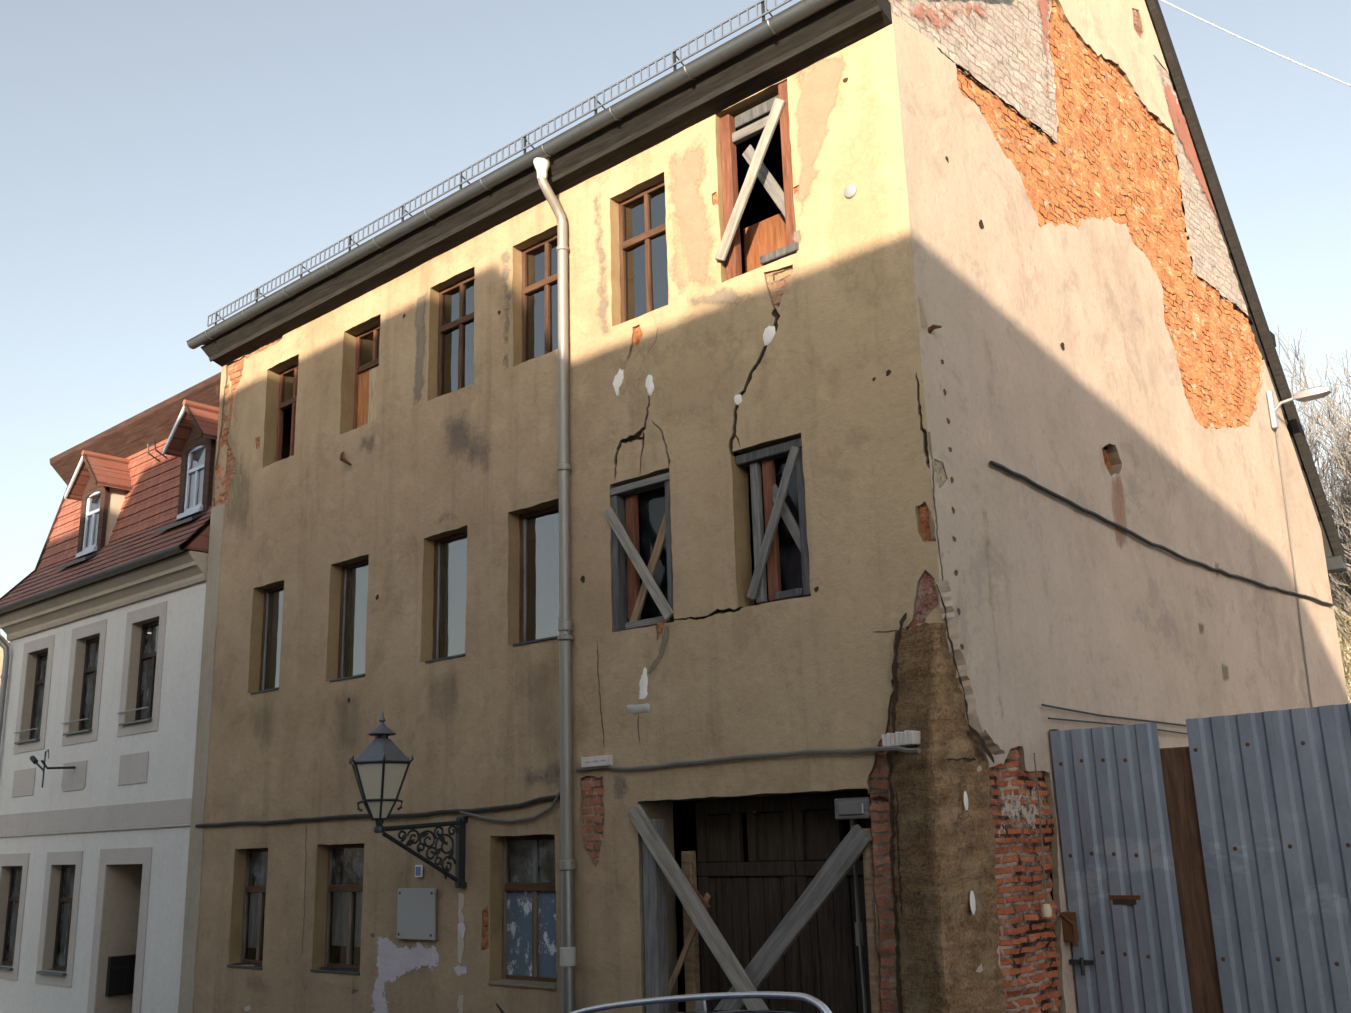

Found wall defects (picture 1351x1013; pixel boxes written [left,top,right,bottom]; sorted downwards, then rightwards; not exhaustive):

spalling [766,267,793,308]
spalling [891,0,1262,429]
spalling [215,337,283,506]
crack [616,329,670,473]
crack [730,309,780,456]
crack [917,378,930,468]
crack [673,606,744,620]
spalling [581,776,605,866]
spalling [869,697,899,1013]
spalling [908,571,1062,1013]